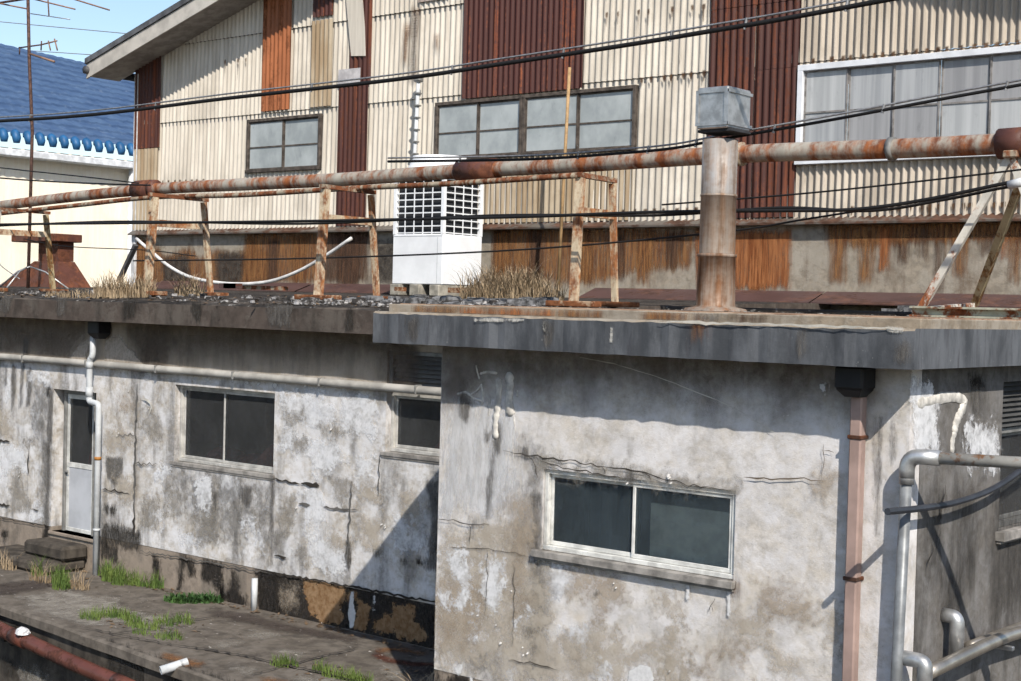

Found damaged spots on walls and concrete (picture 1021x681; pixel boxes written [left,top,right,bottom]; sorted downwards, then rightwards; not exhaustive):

rust [828,204,1021,282]
crack [0,503,47,526]
leakage [0,581,52,595]
leakage [102,456,130,495]
leakage [101,504,141,563]
crack [119,386,435,602]
leakage [173,475,436,649]
leakage [427,391,546,588]
crack [439,519,556,670]
crack [503,450,723,490]
crack [745,445,836,497]
leakage [407,665,469,681]